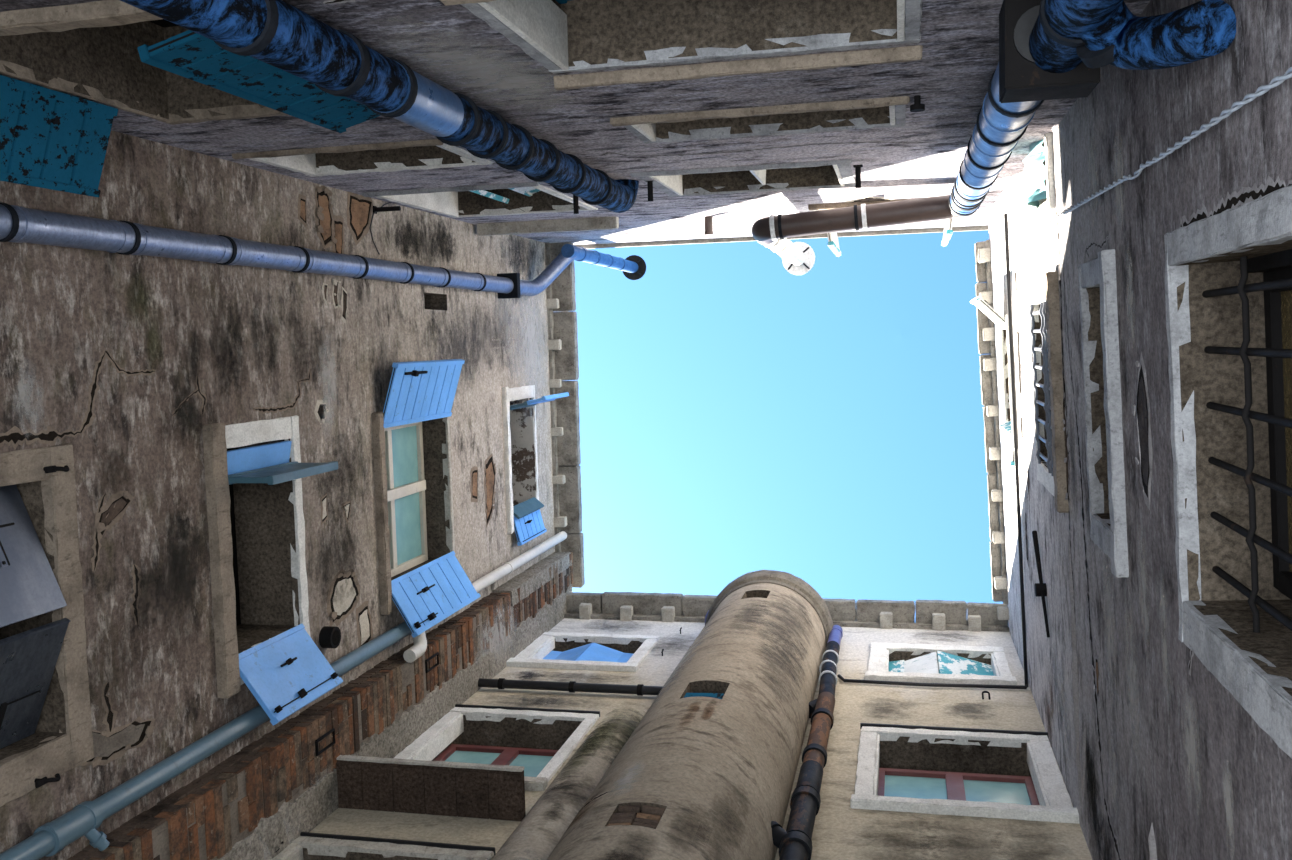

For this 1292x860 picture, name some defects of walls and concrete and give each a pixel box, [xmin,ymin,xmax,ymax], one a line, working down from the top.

peeling [298,185,373,254]
crack [0,350,155,450]
peeling [320,493,351,525]
crack [1055,152,1122,860]
peeling [327,569,373,647]